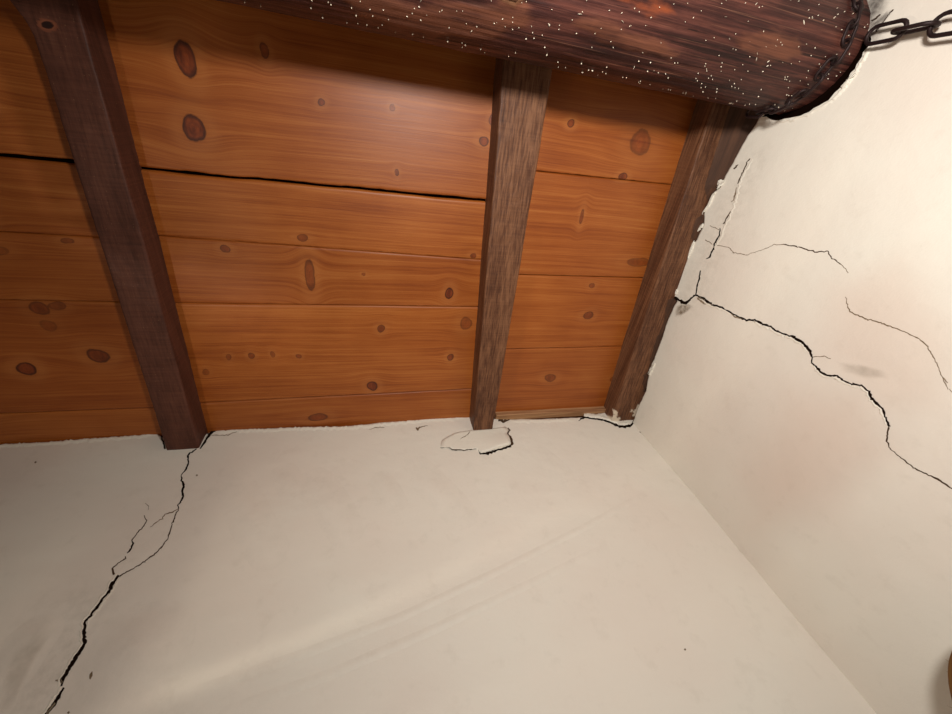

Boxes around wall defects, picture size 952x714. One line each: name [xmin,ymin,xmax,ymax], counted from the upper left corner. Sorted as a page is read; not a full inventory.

crack [41,431,235,714]
peeling [440,419,514,455]
peeling [687,179,725,259]
crack [674,159,952,489]